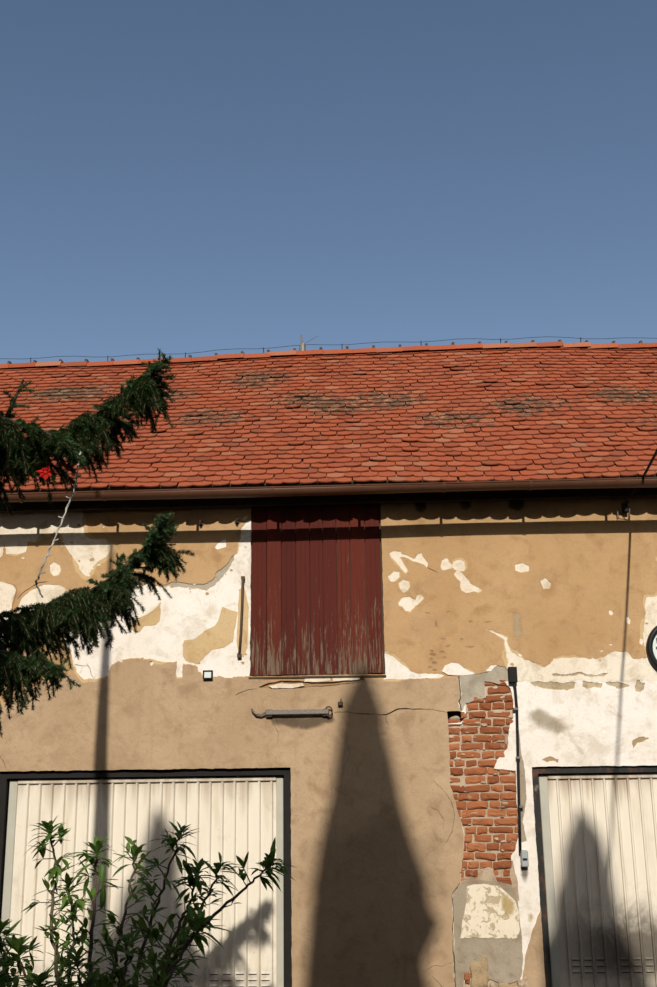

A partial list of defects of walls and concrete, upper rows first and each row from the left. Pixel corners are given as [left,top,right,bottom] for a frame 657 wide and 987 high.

peeling [0,562,68,620]
peeling [0,511,115,580]
peeling [64,516,252,683]
peeling [388,550,437,627]
peeling [440,557,483,593]
peeling [515,563,529,573]
crack [279,681,358,689]
crack [335,673,462,725]
flaking render [382,592,657,987]